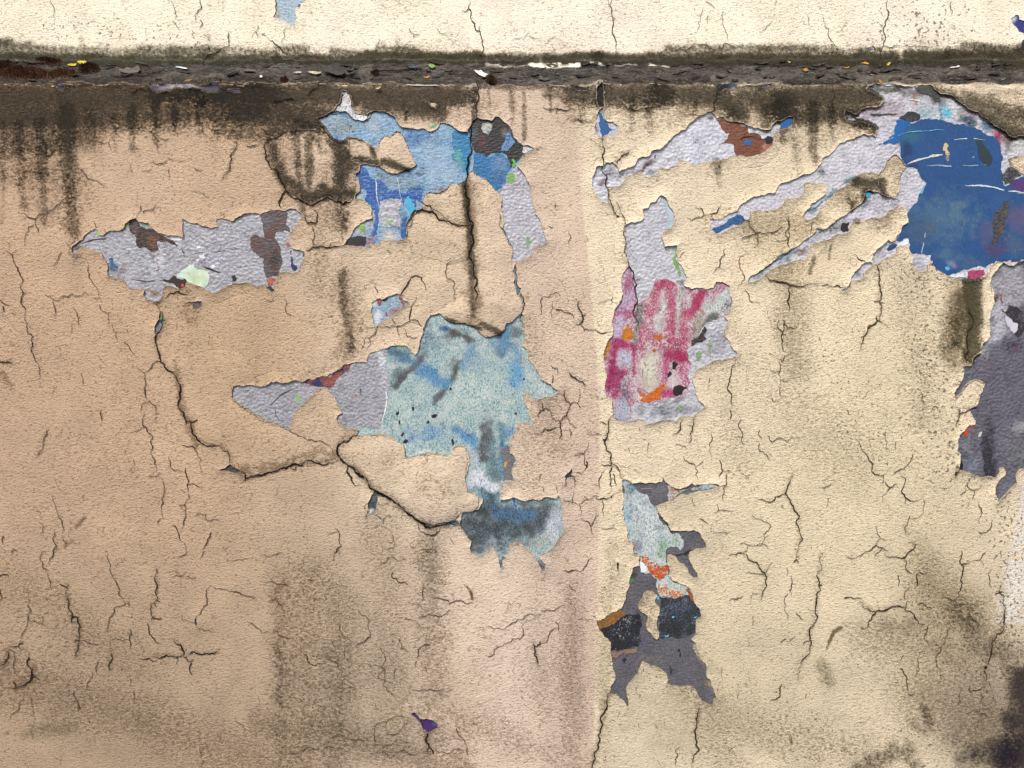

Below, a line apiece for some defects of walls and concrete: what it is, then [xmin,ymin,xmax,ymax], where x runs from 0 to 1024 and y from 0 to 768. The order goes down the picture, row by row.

peeling [62,199,315,345]
peeling [232,65,584,582]
crack [688,204,842,402]
peeling [551,73,1024,513]
crack [854,254,889,348]
crack [0,195,472,745]
crack [484,558,596,663]
crack [535,365,649,533]
peeling [586,467,729,717]
crack [676,361,1006,730]
crack [592,694,608,766]
crack [659,710,700,768]